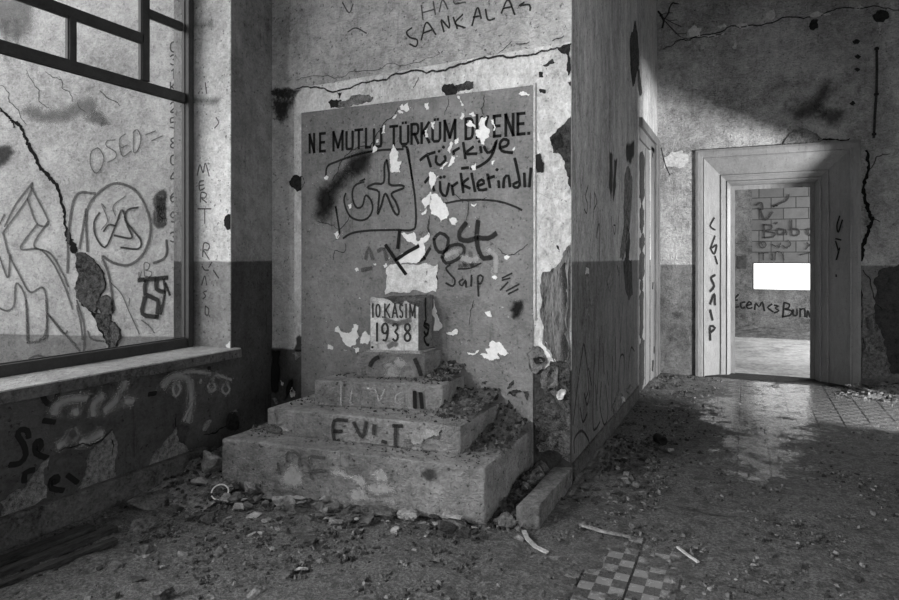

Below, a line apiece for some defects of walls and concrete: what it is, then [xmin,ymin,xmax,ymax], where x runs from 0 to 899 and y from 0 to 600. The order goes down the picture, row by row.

crack [26,70,78,108]
crack [296,36,571,93]
crack [664,5,898,49]
crack [0,85,78,254]
peeling [421,138,459,225]
flaking render [536,153,544,173]
flaking render [550,117,571,188]
flaking render [74,252,122,348]
peeling [335,324,371,353]
flaking render [467,244,571,462]
flaking render [620,150,655,391]
crack [861,150,888,328]